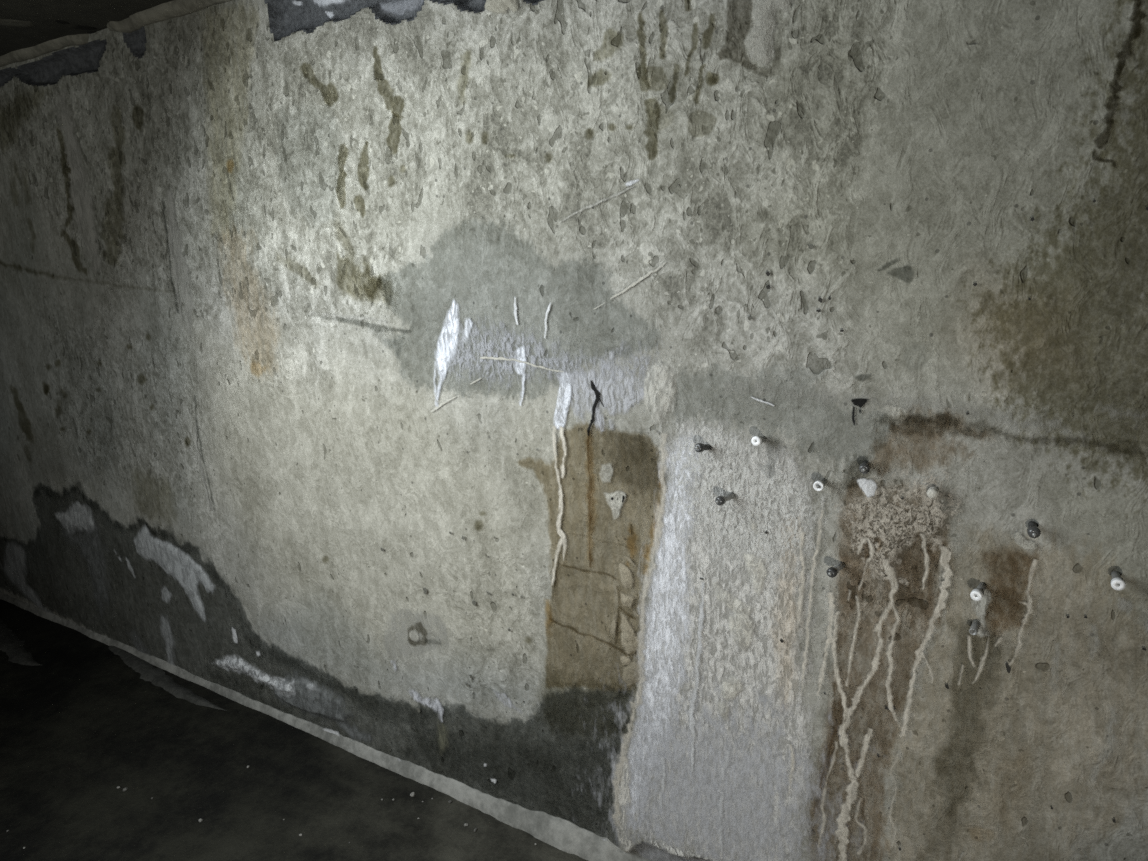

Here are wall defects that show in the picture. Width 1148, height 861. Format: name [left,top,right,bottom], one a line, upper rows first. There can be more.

spalling [0,39,107,87]
spalling [122,27,147,59]
spalling [264,0,486,42]
crack [1093,0,1144,166]
crack [587,380,604,436]
leakage [434,298,952,861]
leakage [1018,560,1038,650]
leakage [217,628,313,694]
leakage [962,636,1000,680]
leakage [410,690,442,722]